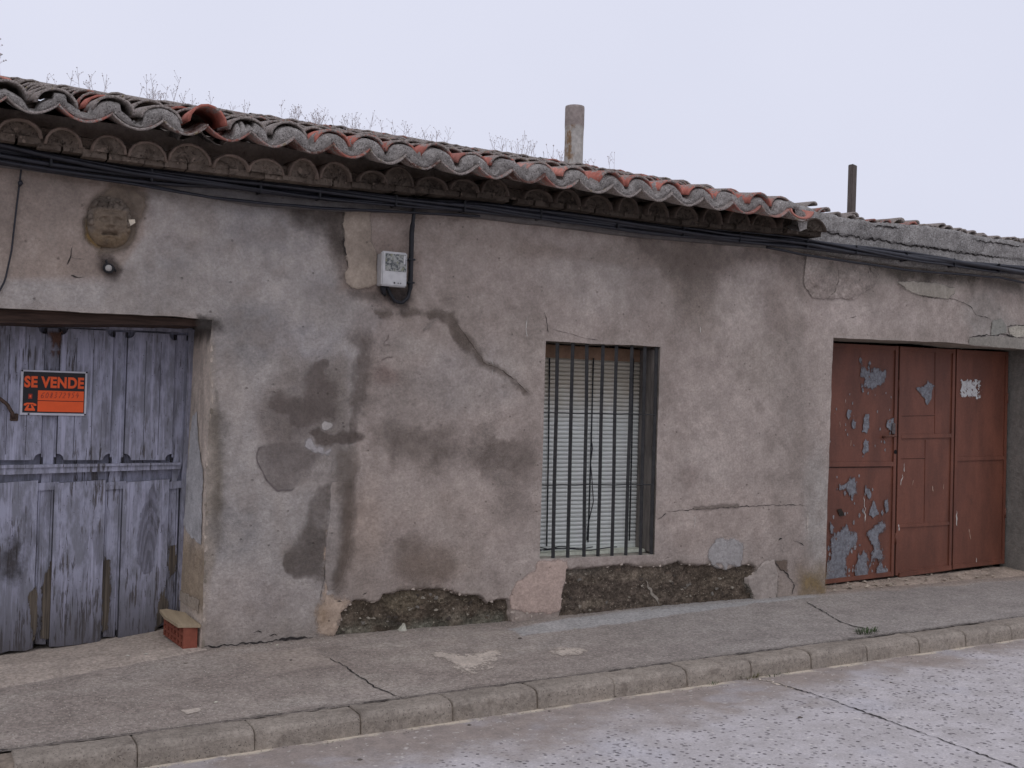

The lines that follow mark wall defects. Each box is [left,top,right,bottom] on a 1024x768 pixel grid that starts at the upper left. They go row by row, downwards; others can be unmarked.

crack [911,293,1024,338]
damp [256,360,362,492]
crack [657,504,805,520]
spalling [317,547,508,636]
spalling [559,562,756,616]